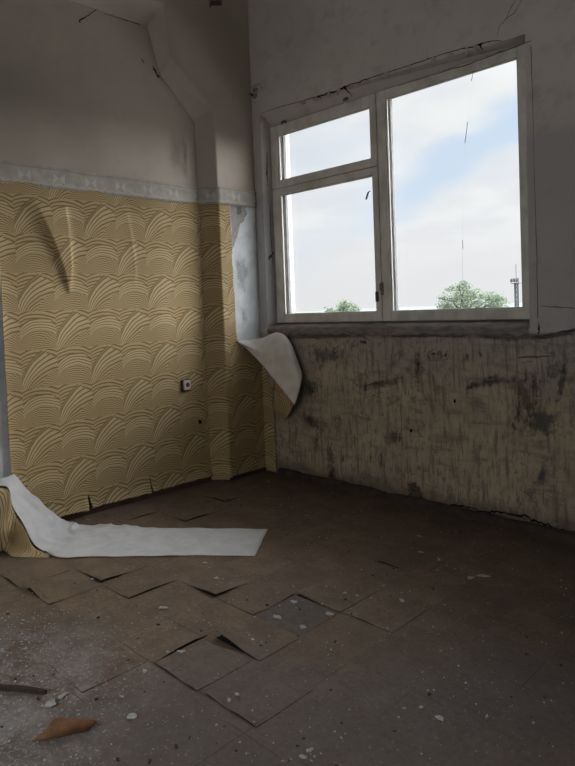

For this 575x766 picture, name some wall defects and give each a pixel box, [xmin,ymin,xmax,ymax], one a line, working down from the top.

crack [79,9,140,25]
crack [263,0,522,113]
peeling [256,595,339,636]